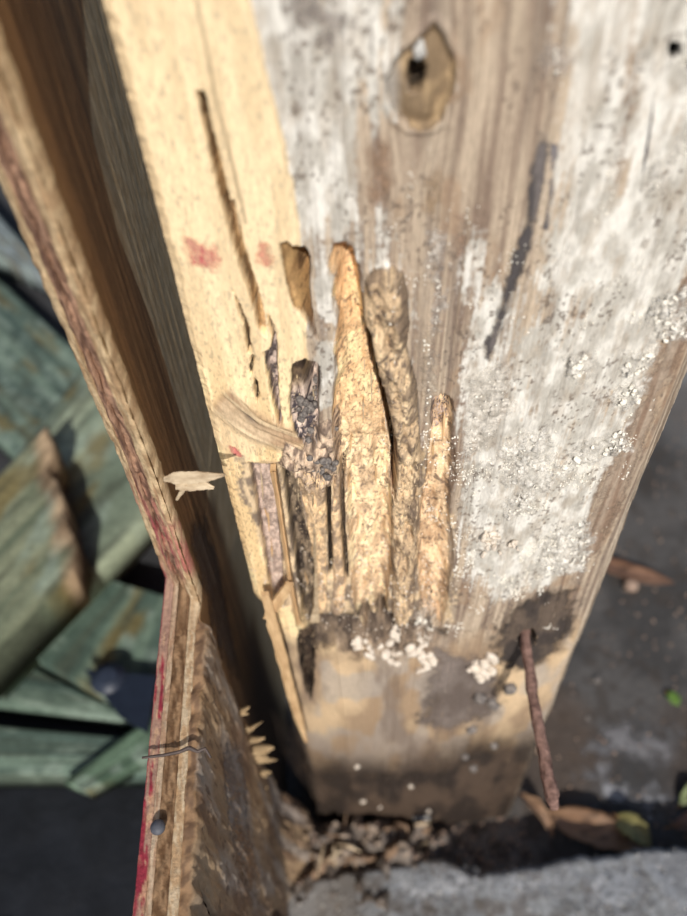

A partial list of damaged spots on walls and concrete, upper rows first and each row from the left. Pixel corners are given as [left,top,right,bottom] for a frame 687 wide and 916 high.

crack [201,90,266,397]
peeling [420,232,447,425]
damp [293,739,537,825]
damp [415,648,502,729]